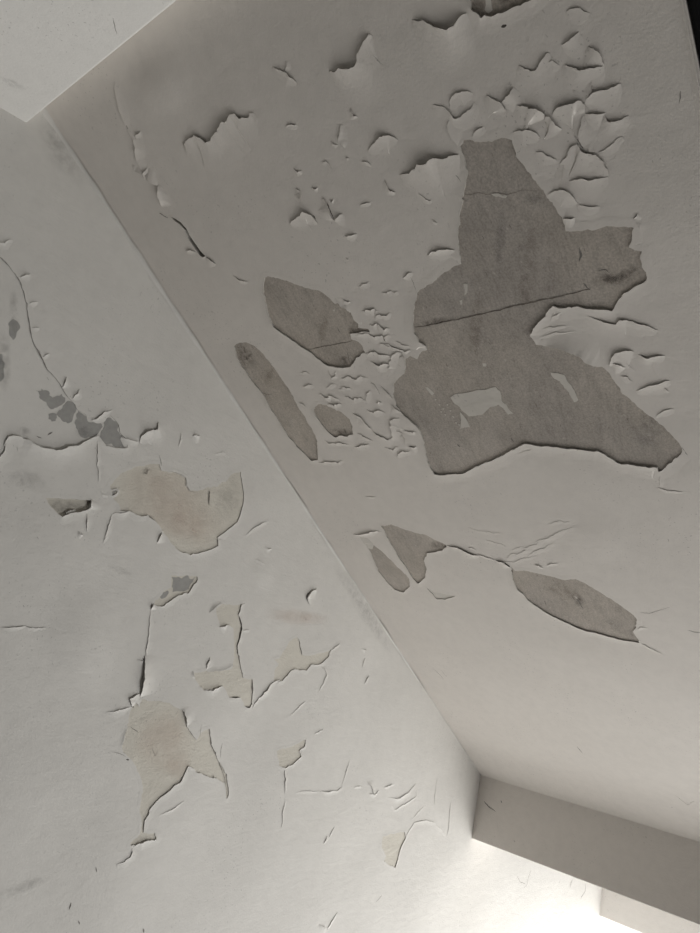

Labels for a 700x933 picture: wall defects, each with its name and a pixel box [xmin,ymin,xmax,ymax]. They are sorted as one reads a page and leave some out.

peeling [412,0,551,73]
peeling [182,112,258,176]
peeling [230,127,692,484]
peeling [0,251,247,612]
peeling [353,522,645,647]
peeling [191,600,256,712]
peeling [272,634,340,693]
peeling [106,693,232,869]